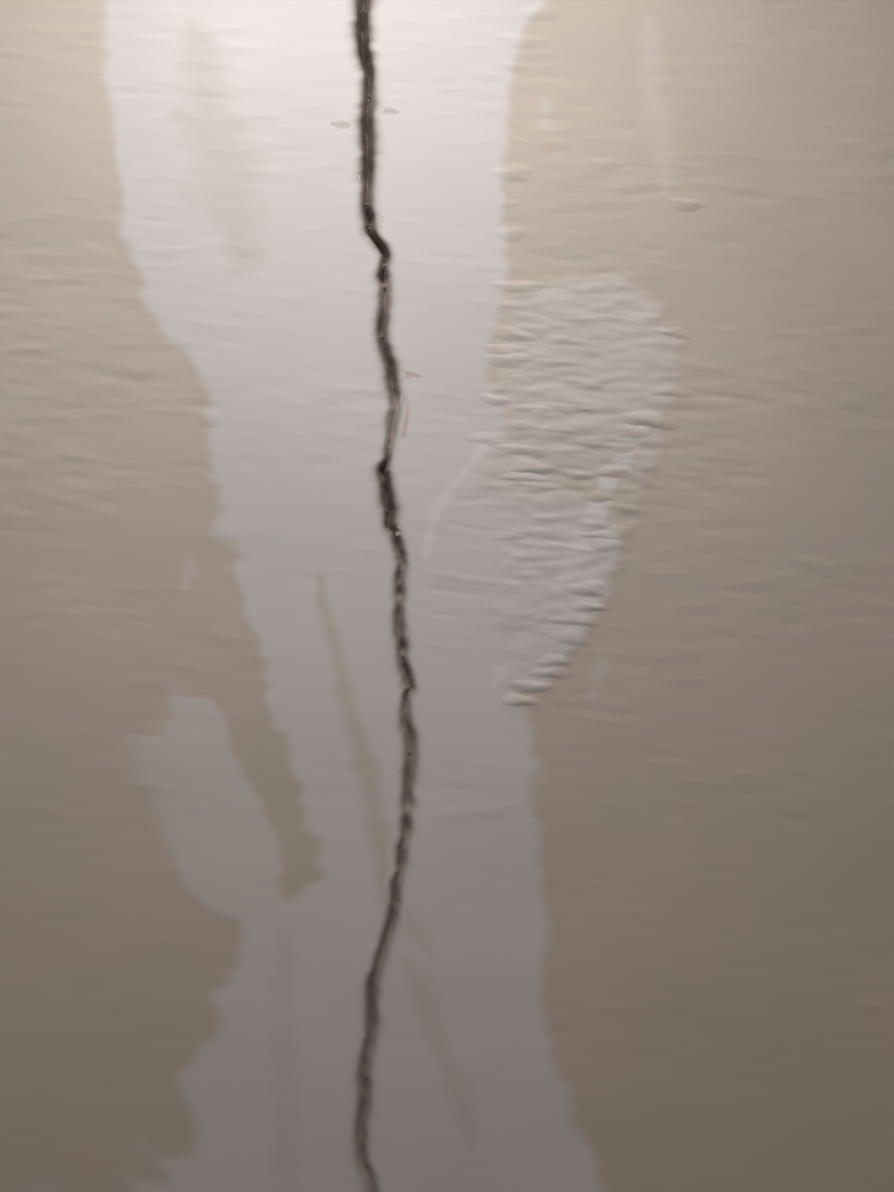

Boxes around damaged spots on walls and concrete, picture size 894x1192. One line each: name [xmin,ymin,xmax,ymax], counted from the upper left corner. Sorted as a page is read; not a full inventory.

crack [342,0,426,1192]